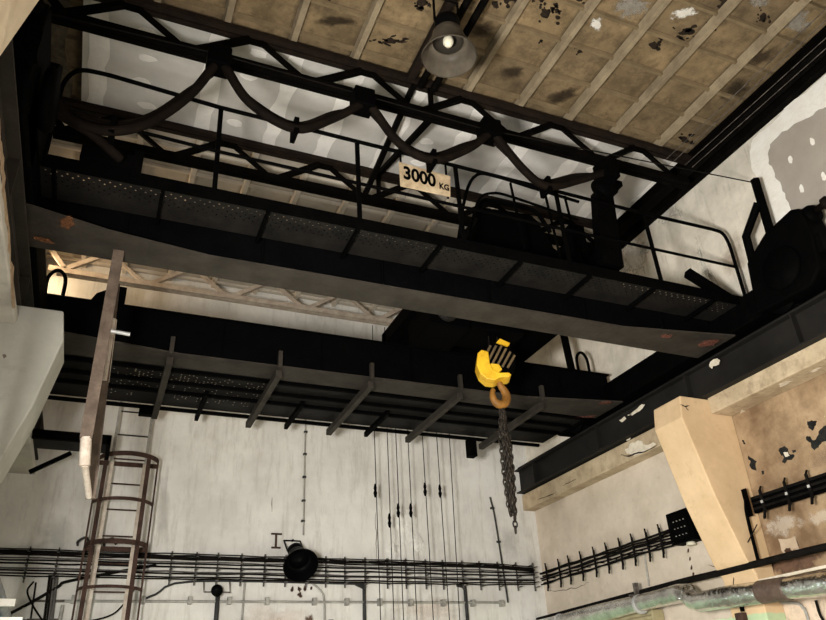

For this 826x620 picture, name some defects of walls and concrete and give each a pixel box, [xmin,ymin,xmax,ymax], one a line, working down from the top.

peeling [532,0,562,25]
spalling [623,438,657,457]
peeling [778,446,796,463]
peeling [806,420,826,450]